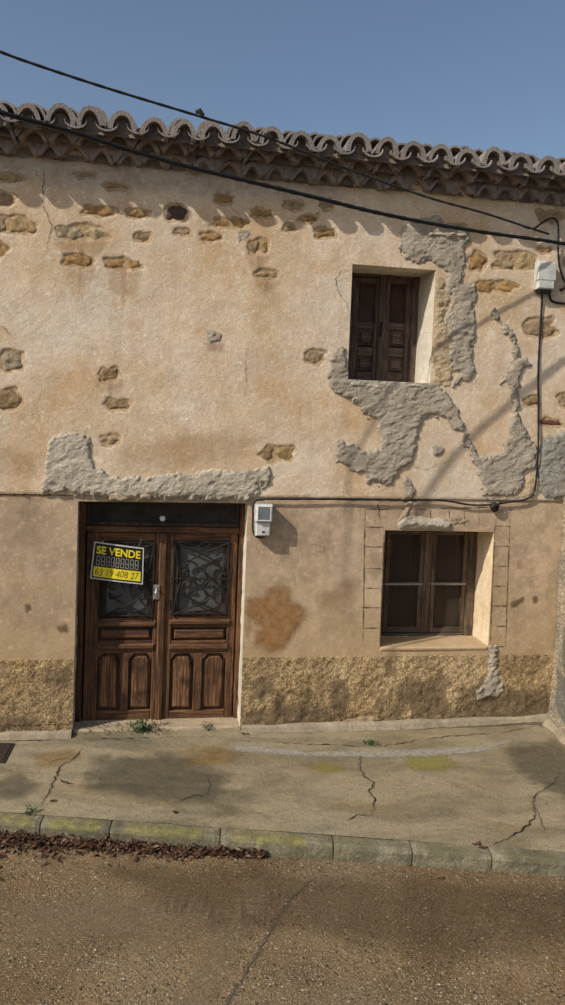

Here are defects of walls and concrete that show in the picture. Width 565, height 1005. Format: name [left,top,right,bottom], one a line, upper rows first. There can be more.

spalling [99,433,120,447]
peeling [516,478,535,499]
peeling [107,493,153,501]